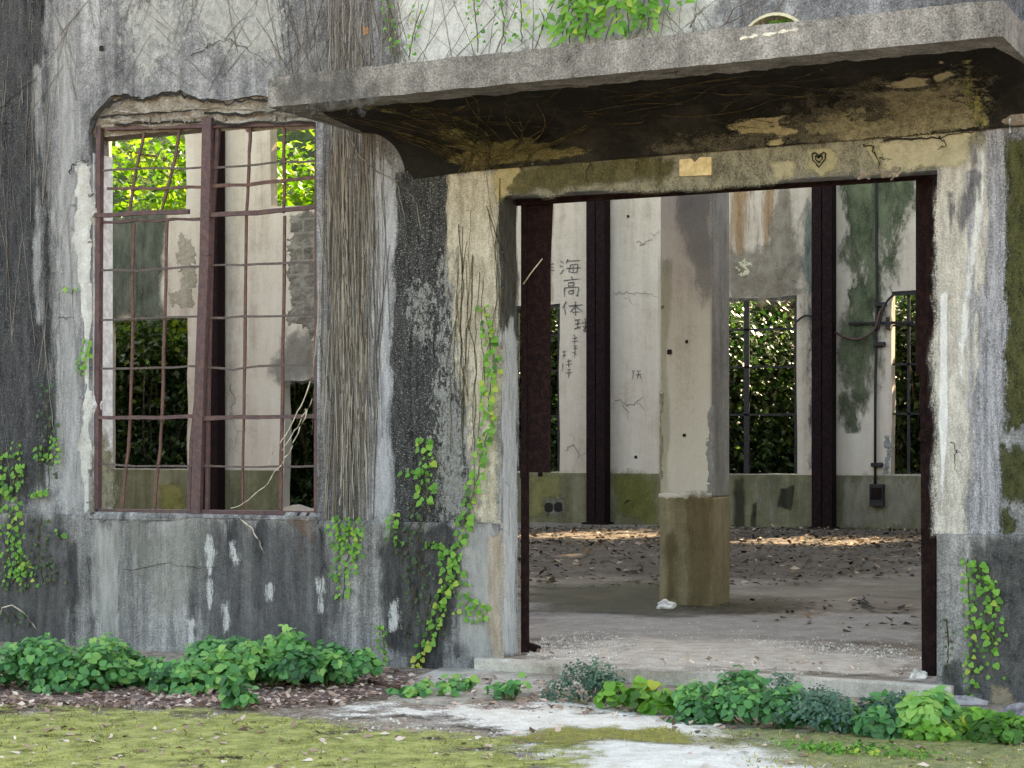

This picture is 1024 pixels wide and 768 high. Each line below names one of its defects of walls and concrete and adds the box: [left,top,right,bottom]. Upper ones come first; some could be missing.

spalling [91,92,316,134]
crack [863,130,982,170]
peeling [70,159,106,522]
leakage [837,181,916,433]
leakage [366,152,504,669]
leakage [938,128,1024,702]
leakage [529,474,566,519]
leakage [613,472,656,525]
leakage [186,619,196,644]
leakage [204,534,239,633]
leakage [315,578,325,614]
leakage [518,495,828,616]